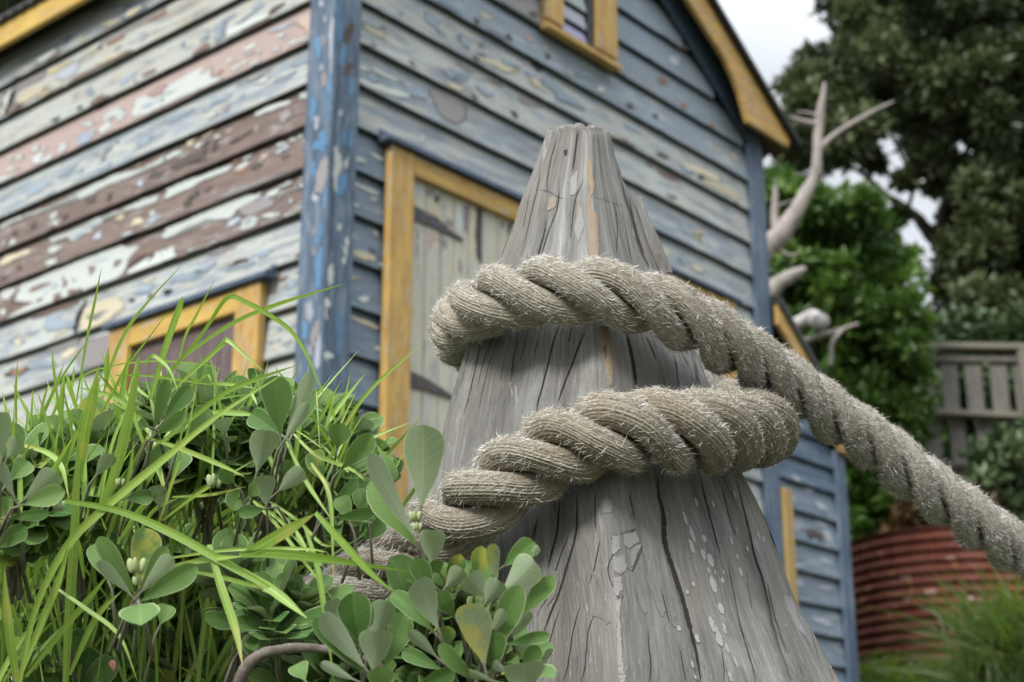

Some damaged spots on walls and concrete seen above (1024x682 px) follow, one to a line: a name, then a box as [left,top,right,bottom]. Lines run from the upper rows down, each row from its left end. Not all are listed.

peeling [225,2,286,38]
peeling [36,36,98,75]
peeling [271,32,309,53]
peeling [0,76,25,116]
peeling [81,43,261,134]
peeling [253,91,307,131]
peeling [359,66,412,98]
peeling [355,182,381,202]
peeling [0,134,305,321]
crack [531,473,791,682]